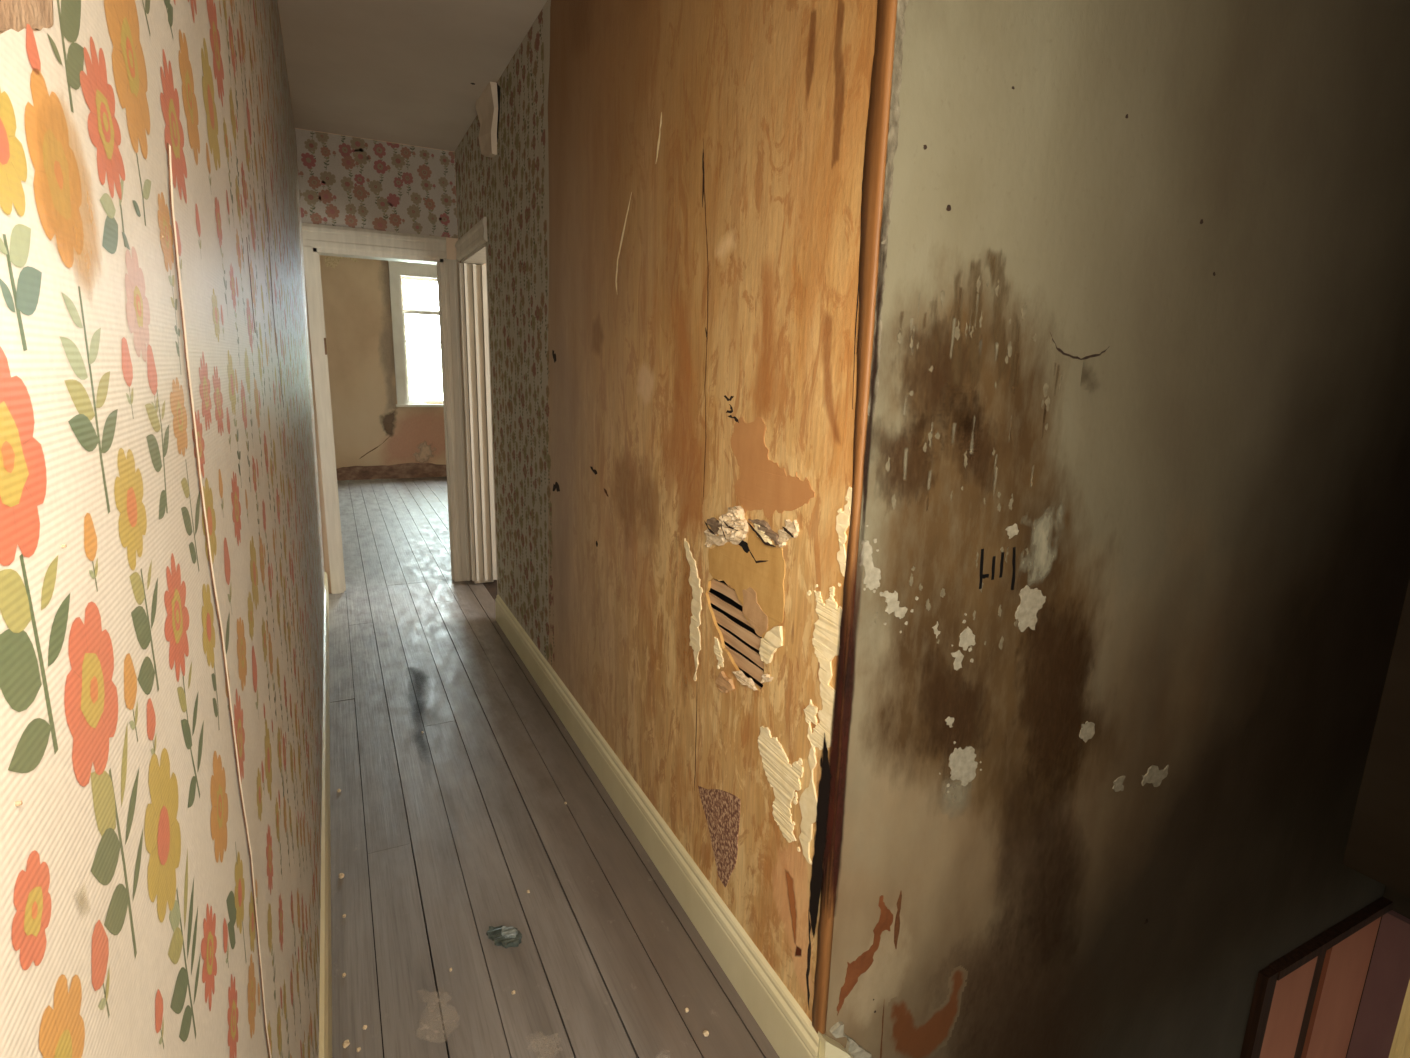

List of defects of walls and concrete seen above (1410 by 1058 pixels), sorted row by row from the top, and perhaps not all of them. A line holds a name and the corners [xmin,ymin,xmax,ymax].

flaking render [684,417,815,693]
spalling [1005,524,1019,539]
peeling [758,487,919,864]
spalling [932,613,976,670]
leakage [822,215,1135,1058]
spalling [1015,585,1046,632]
spalling [939,717,982,806]
spalling [1079,721,1095,743]
corrosion [887,965,968,1058]